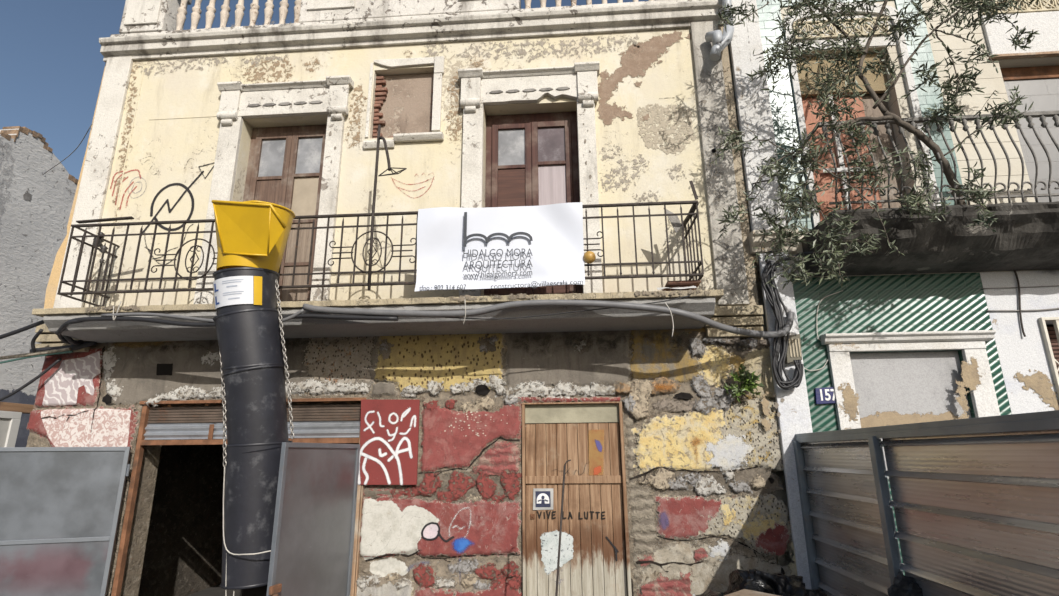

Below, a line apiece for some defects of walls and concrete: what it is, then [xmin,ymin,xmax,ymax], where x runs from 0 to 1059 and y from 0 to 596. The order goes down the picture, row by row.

peeling [422,29,696,203]
peeling [100,346,124,404]
spalling [156,363,173,375]
peeling [143,385,224,406]
peeling [201,351,220,365]
spalling [677,331,770,361]
peeling [760,392,784,442]
peeling [838,382,860,421]
peeling [955,357,982,419]
peeling [1014,369,1059,410]
spalling [285,374,737,504]
spalling [629,466,783,500]